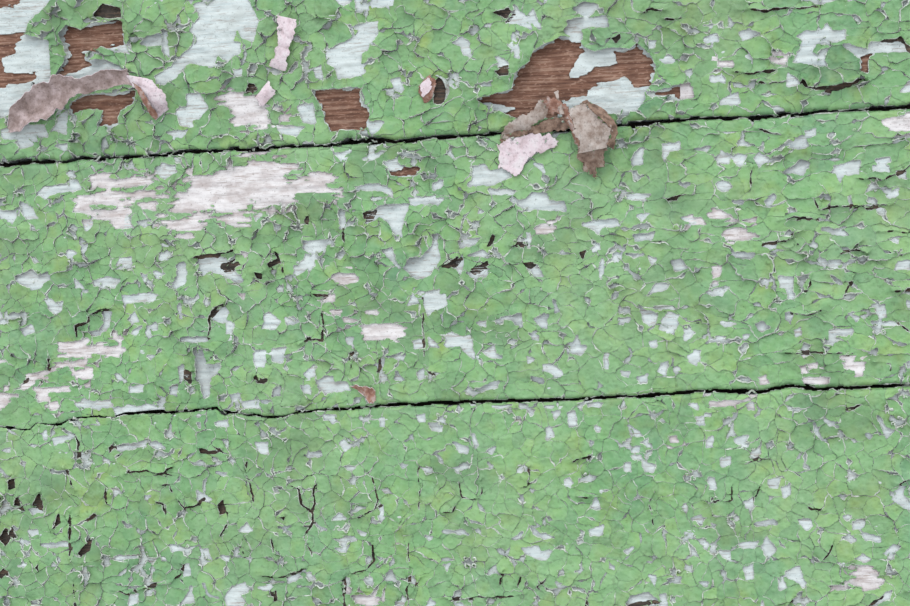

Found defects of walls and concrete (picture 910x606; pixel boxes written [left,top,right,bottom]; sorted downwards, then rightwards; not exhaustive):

peeling [0,0,394,151]
peeling [464,2,741,132]
crack [735,69,865,93]
crack [880,36,910,53]
peeling [37,151,348,261]
peeling [355,180,450,315]
crack [761,200,885,246]
peeling [0,245,257,417]
peeling [317,267,503,383]
crack [127,467,206,515]
crack [262,485,317,578]
crack [628,598,660,606]